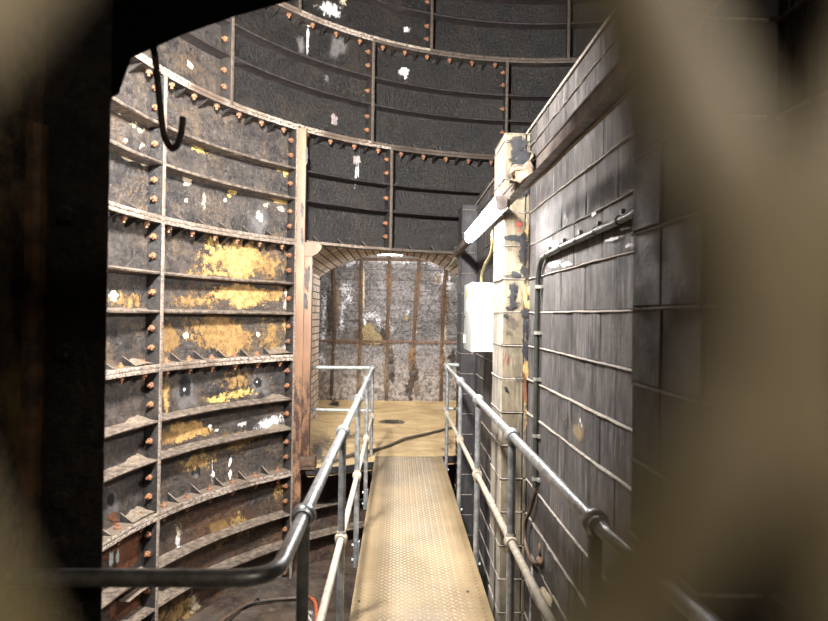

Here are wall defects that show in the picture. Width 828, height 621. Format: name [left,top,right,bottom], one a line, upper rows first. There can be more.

water stain [338,282,355,332]
corrosion [326,261,392,393]
corrosion [407,270,423,369]
corrosion [438,273,449,382]
water stain [237,415,284,430]
corrosion [103,530,142,568]